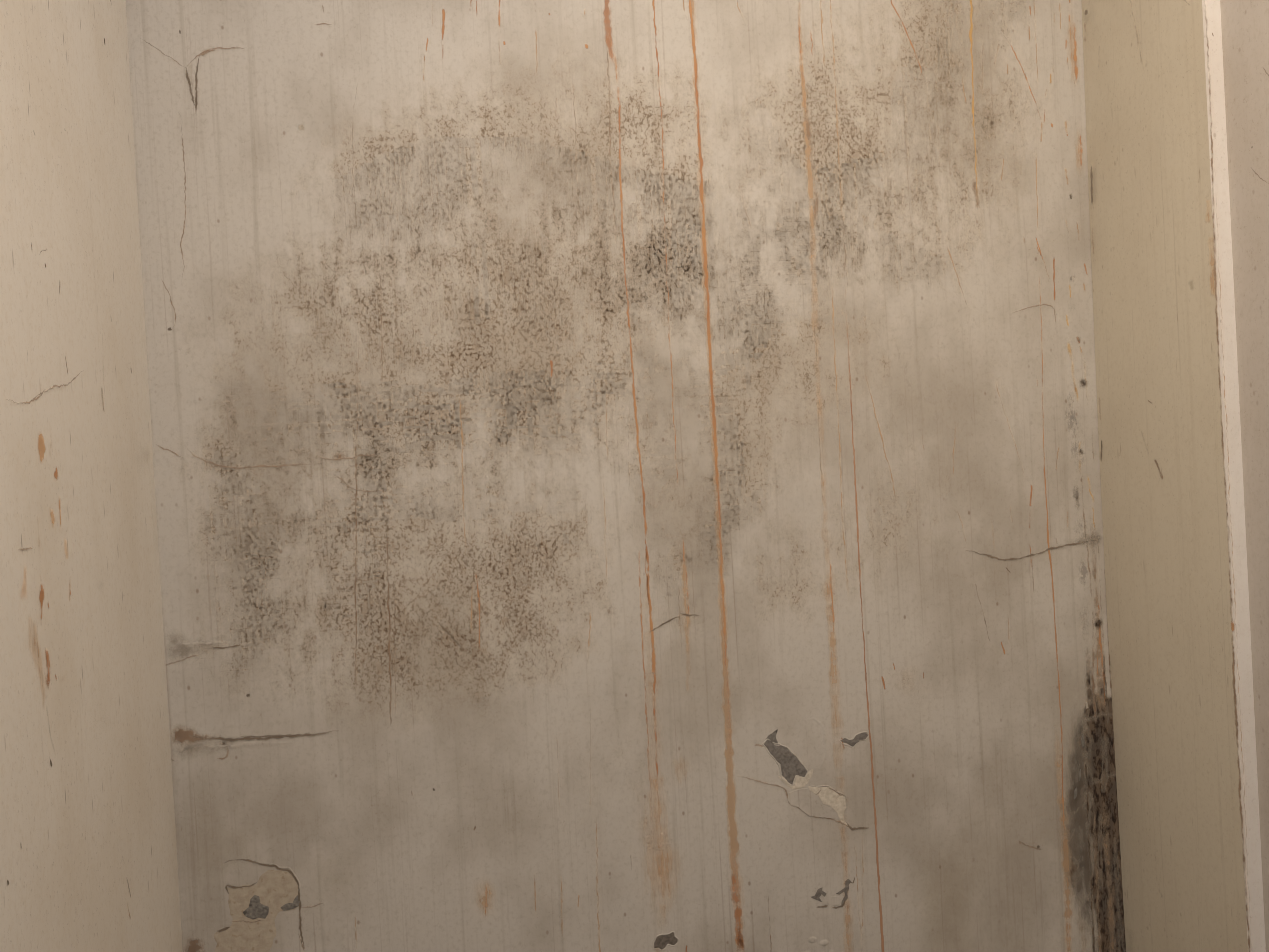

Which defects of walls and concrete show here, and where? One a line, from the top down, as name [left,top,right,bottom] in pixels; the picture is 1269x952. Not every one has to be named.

crack [149,30,235,110]
rust [604,0,617,68]
mould [745,0,964,278]
mould [202,82,834,704]
rust [609,91,656,693]
rust [683,0,744,948]
crack [974,536,1099,561]
crack [171,729,331,760]
spalling [755,717,869,830]
damp [1067,597,1126,952]
spalling [187,859,304,952]
spalling [653,931,679,951]